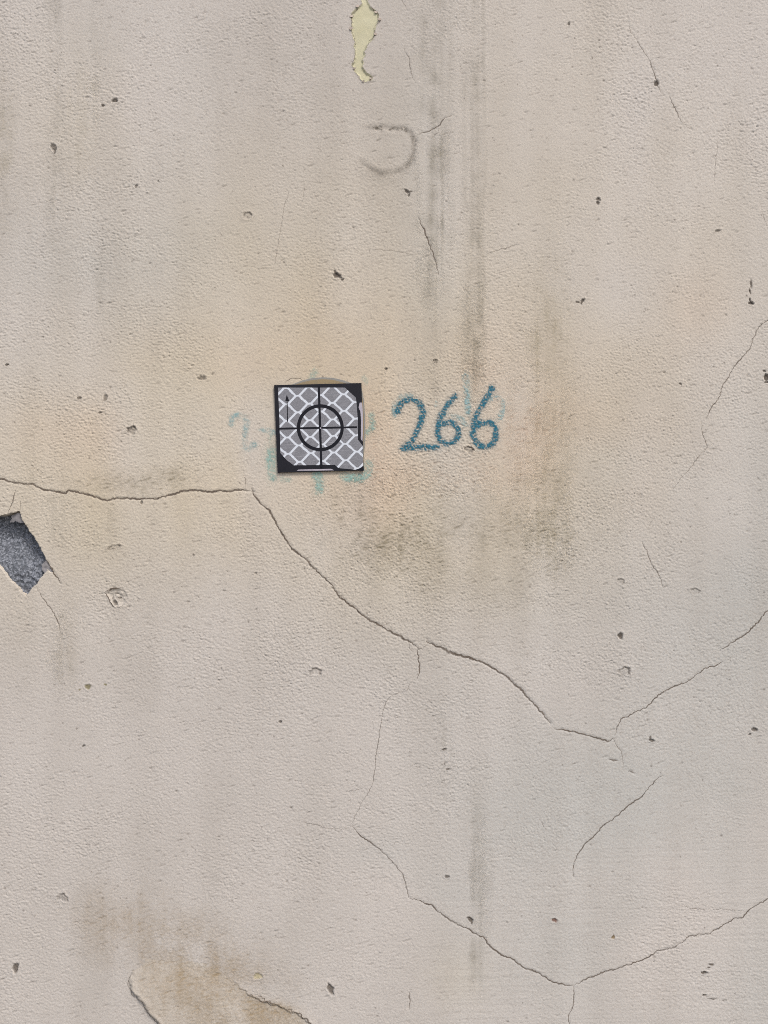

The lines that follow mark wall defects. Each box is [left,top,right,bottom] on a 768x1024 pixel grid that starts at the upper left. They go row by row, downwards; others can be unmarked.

peeling [349,0,381,82]
spalling [0,513,53,594]
crack [0,478,767,875]
crack [355,829,768,1024]